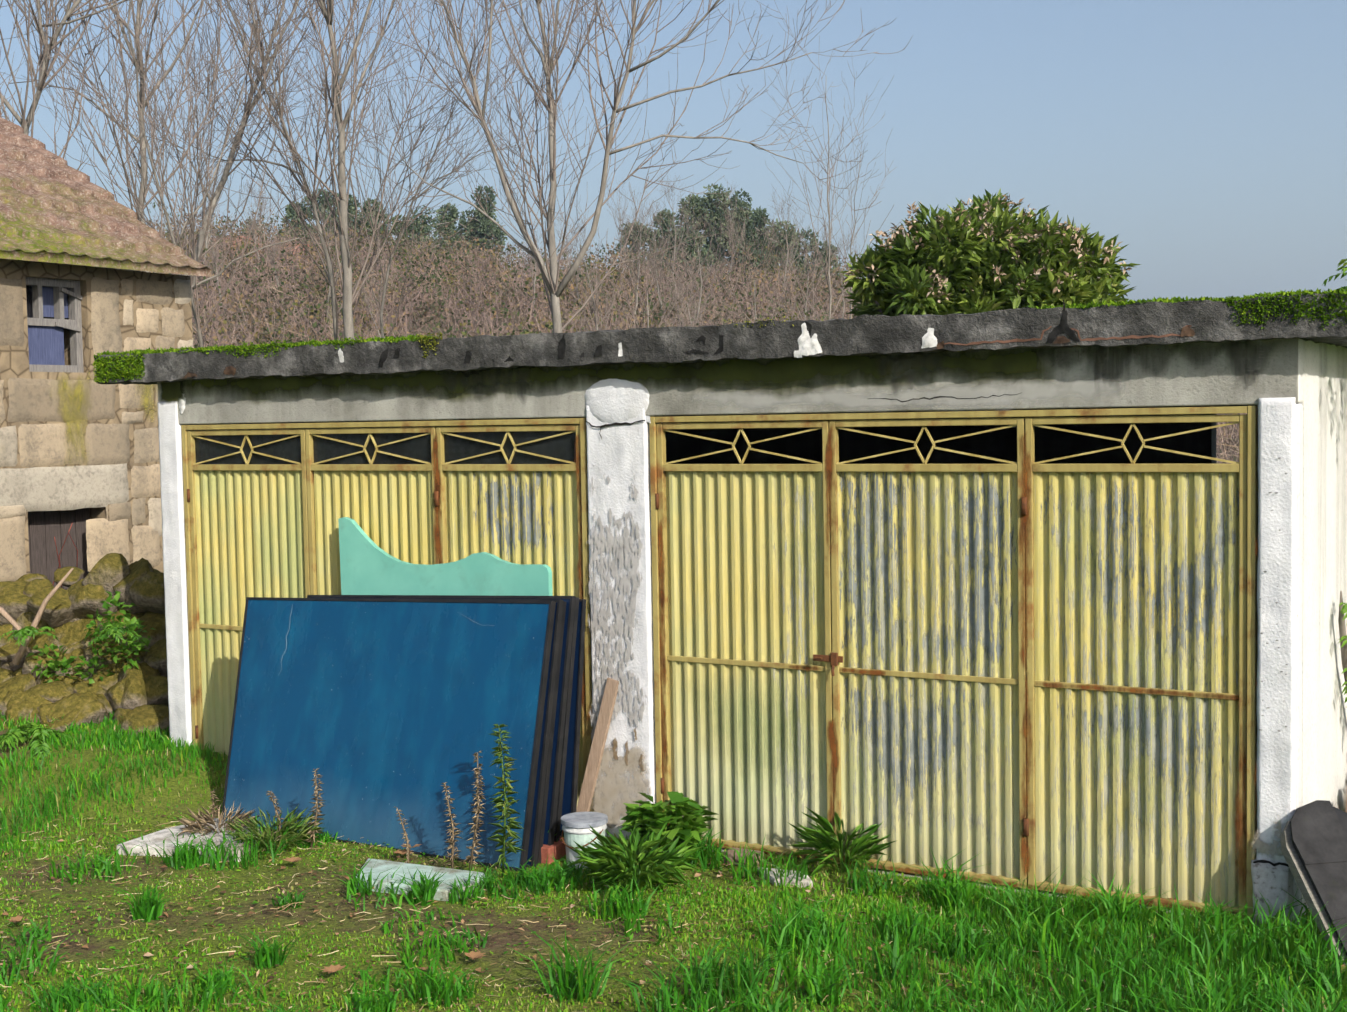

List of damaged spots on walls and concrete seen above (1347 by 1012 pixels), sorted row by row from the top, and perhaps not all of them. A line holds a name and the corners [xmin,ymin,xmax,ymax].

crack [869,393,1020,402]
damp [704,344,1272,408]
peeling [473,471,554,560]
corrosion [825,429,833,540]
corrosion [1019,435,1030,604]
peeling [587,477,651,828]
corrosion [828,720,838,838]
peeling [839,472,1017,841]
corrosion [1023,685,1031,815]
peeling [1041,473,1239,878]
corrosion [1043,683,1239,700]
corrosion [962,834,1038,889]